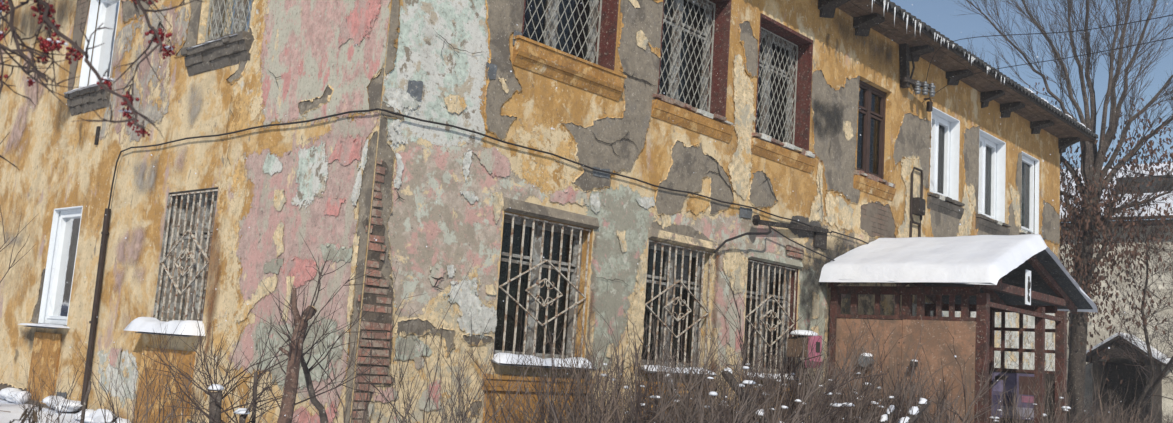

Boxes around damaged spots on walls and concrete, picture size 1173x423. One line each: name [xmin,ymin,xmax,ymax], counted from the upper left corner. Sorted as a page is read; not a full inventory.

peeling [994,312,1055,371]